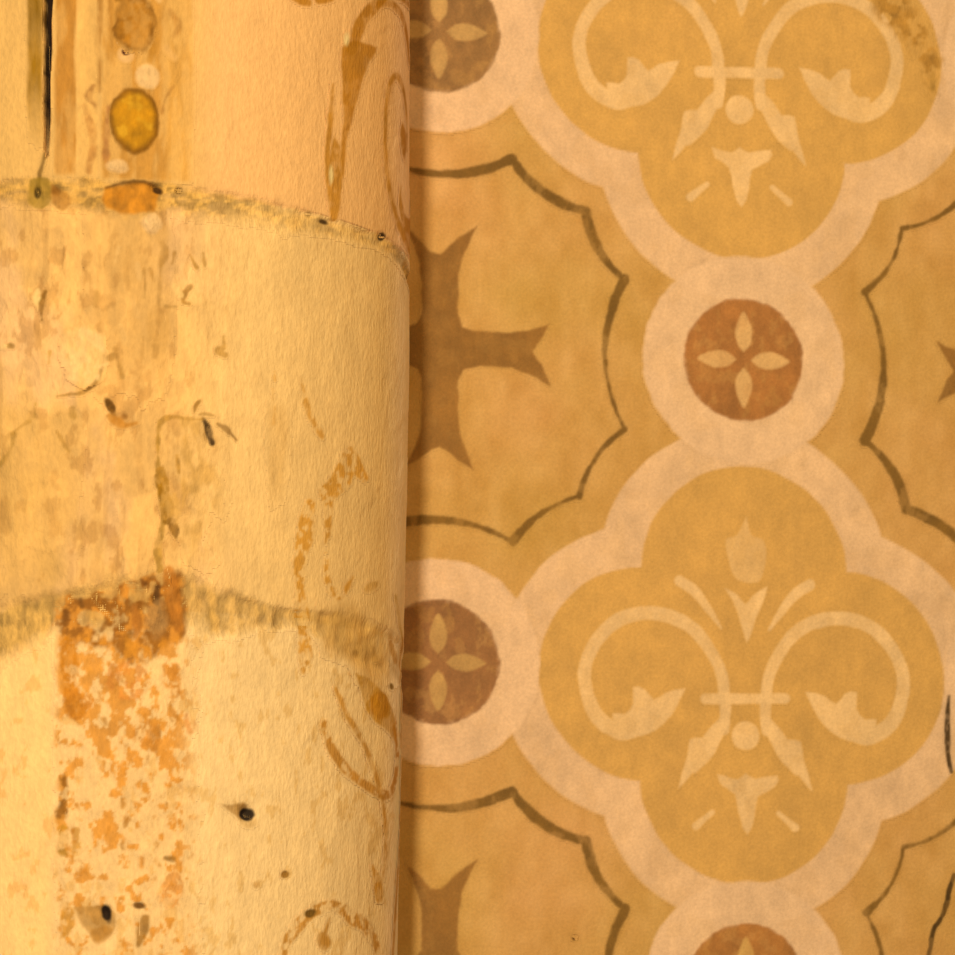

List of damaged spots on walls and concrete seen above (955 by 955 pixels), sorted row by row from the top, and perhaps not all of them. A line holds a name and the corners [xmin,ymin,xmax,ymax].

crack [36,0,53,176]
leakage [308,594,389,699]
peeling [50,627,206,955]